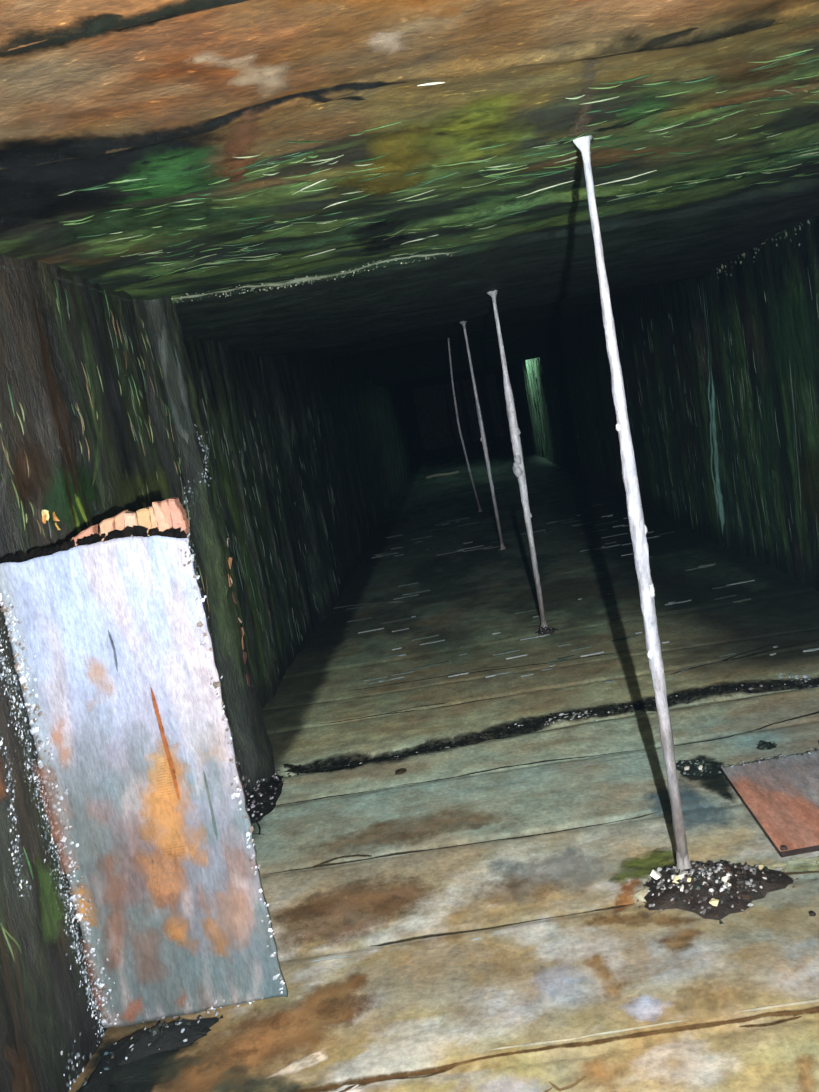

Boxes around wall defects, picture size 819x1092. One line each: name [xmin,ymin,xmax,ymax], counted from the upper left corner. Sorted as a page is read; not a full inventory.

crack [0,0,249,58]
leakage [0,134,216,232]
leakage [716,220,810,279]
crack [314,649,636,725]
crack [675,711,819,746]
corrosion [140,687,204,905]
crack [297,999,819,1092]